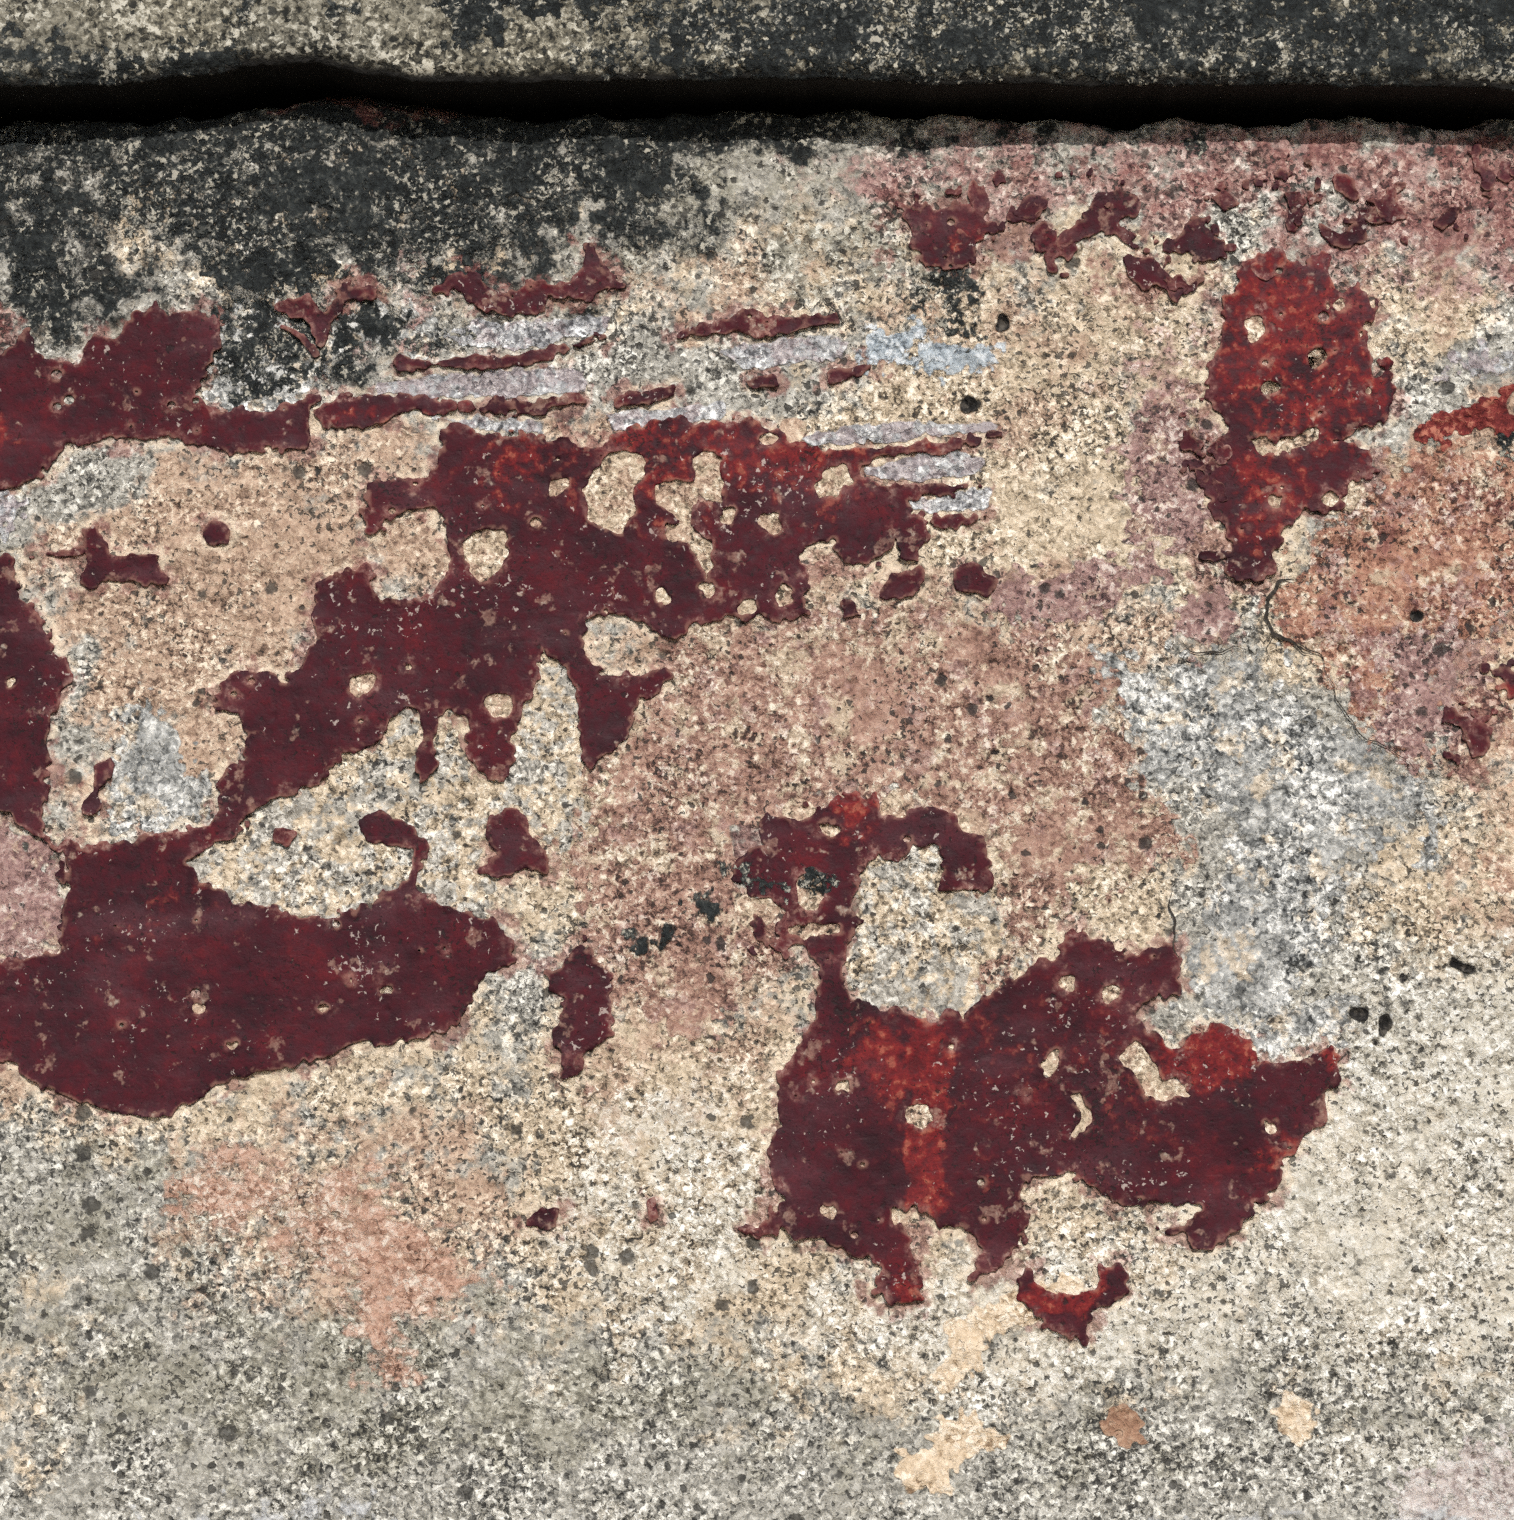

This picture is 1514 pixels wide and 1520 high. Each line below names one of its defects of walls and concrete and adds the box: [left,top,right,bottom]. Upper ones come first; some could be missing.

leakage [0,0,257,88]
leakage [325,0,361,22]
leakage [0,100,703,434]
peeling [895,153,1408,582]
leakage [606,401,726,431]
leakage [802,420,997,514]
peeling [0,242,1003,1118]
peeling [1441,658,1514,778]
peeling [731,638,1448,1306]
spalling [1448,957,1476,973]
peeling [526,1207,559,1231]
peeling [1016,1262,1130,1347]